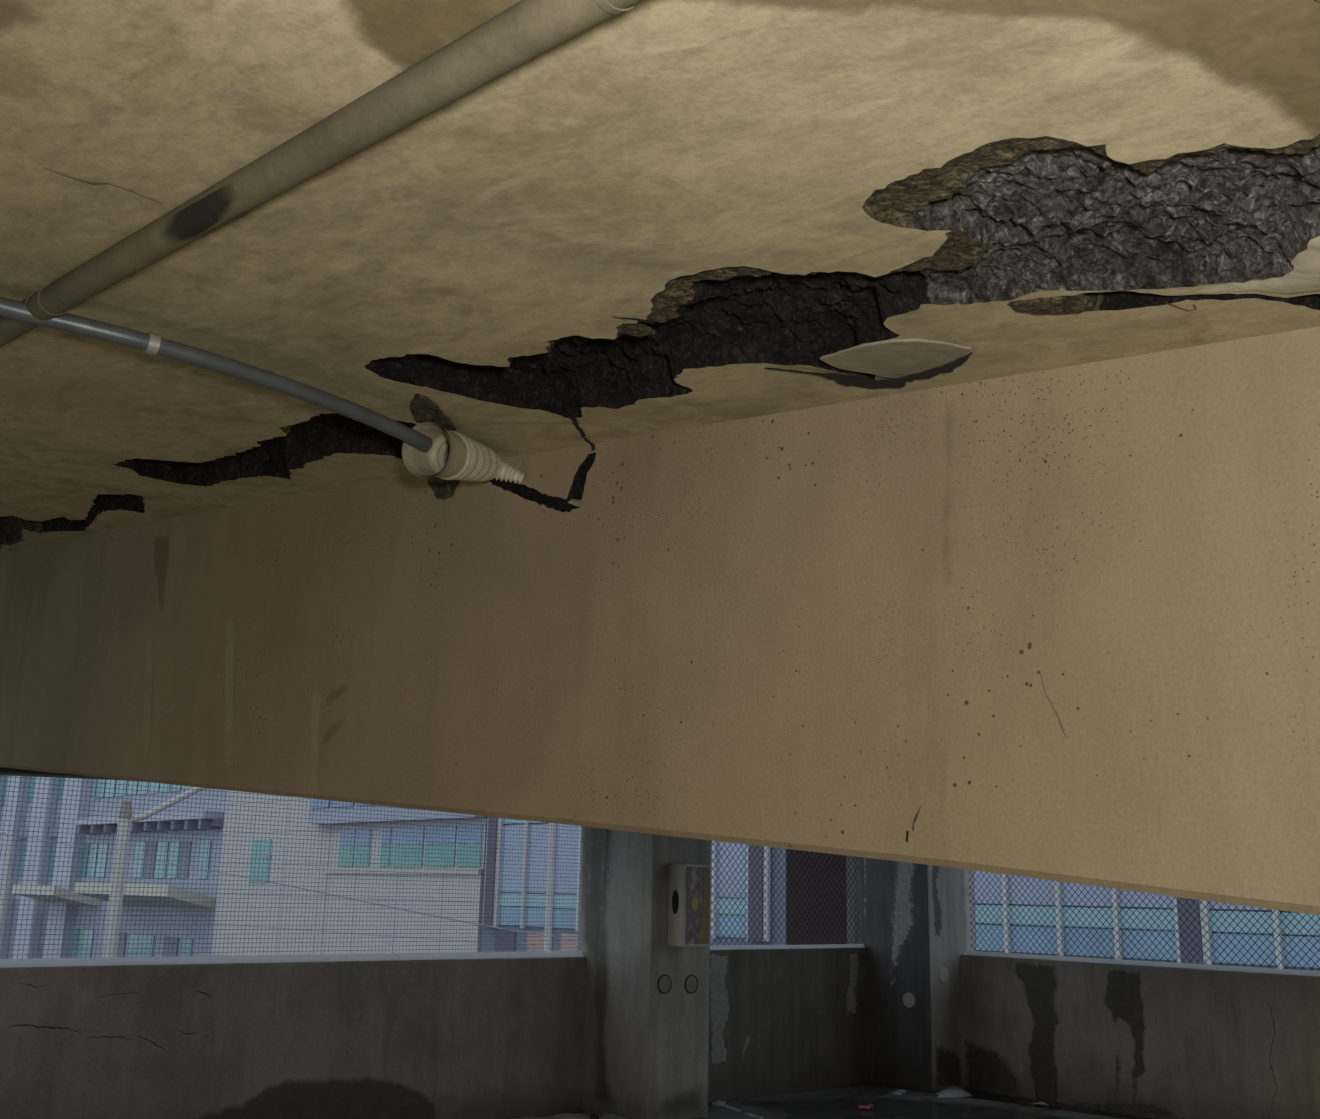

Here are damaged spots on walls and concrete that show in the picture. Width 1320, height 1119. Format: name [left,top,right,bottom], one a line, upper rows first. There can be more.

leakage [350,0,522,68]
leakage [736,0,1320,134]
spalling [113,134,1320,486]
crack [0,494,145,548]
spalling [428,477,459,500]
crack [489,453,596,513]
leakage [889,861,914,985]
leakage [932,865,942,935]
leakage [935,964,1170,1119]
leakage [203,1079,435,1119]